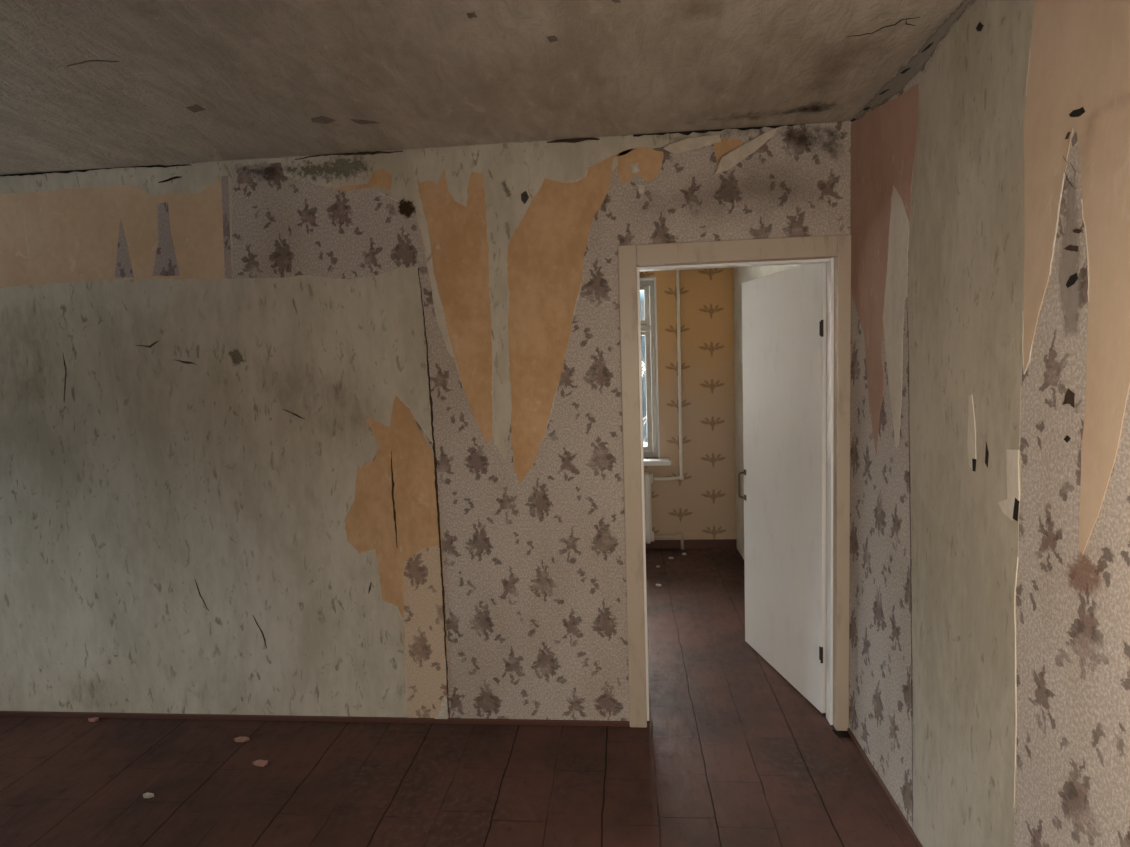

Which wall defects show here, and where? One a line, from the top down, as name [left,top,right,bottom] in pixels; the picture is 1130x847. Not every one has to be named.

spalling [1062,389,1075,408]